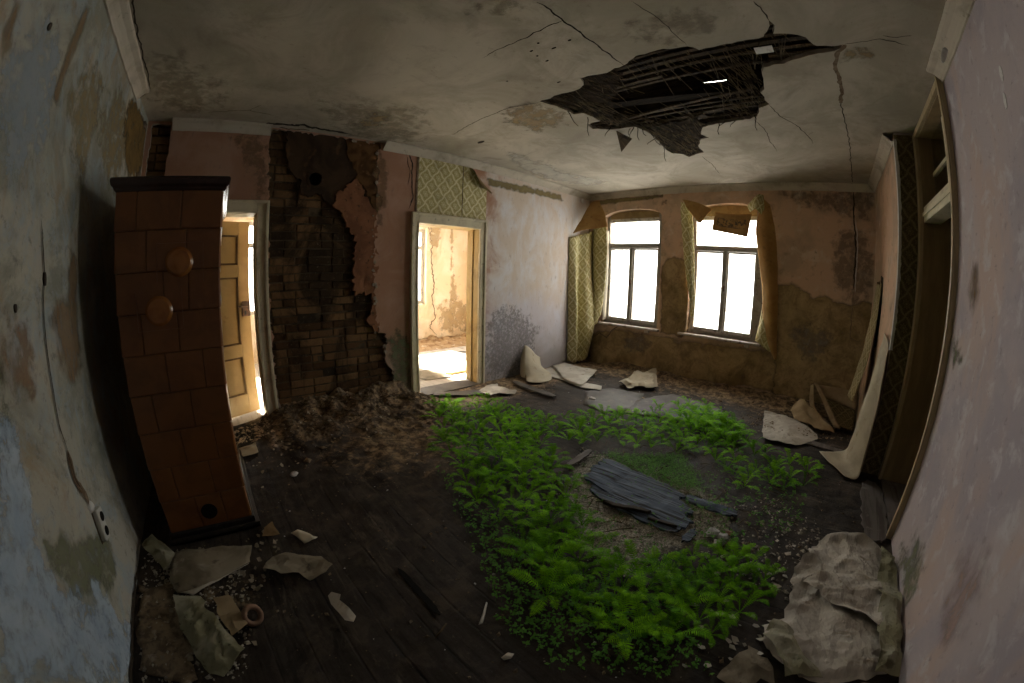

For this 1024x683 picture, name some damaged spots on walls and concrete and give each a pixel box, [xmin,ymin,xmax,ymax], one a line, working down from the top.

crack [483,2,623,65]
crack [41,221,89,504]
spalling [266,130,394,405]
crack [833,35,904,342]